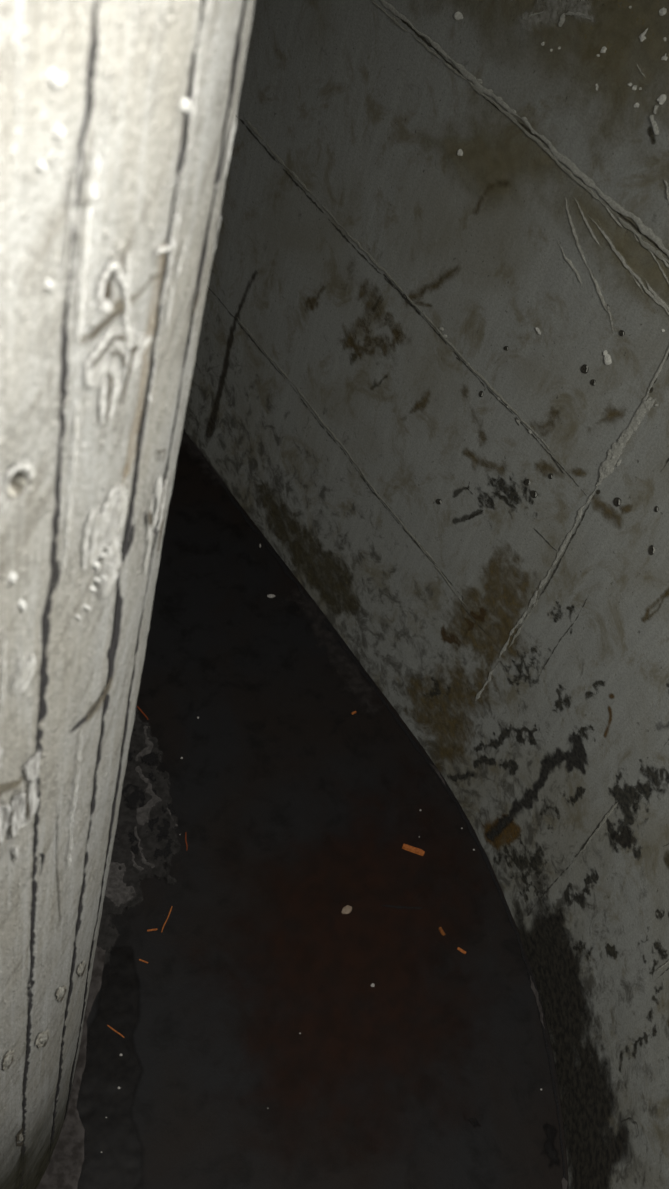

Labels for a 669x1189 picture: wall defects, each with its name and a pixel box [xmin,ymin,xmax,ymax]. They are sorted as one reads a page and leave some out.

crack [19,0,212,1189]
crack [163,0,669,1180]
damp [503,646,550,692]
damp [554,684,571,711]
peeling [0,750,41,860]
damp [449,724,540,782]
damp [486,725,669,1189]